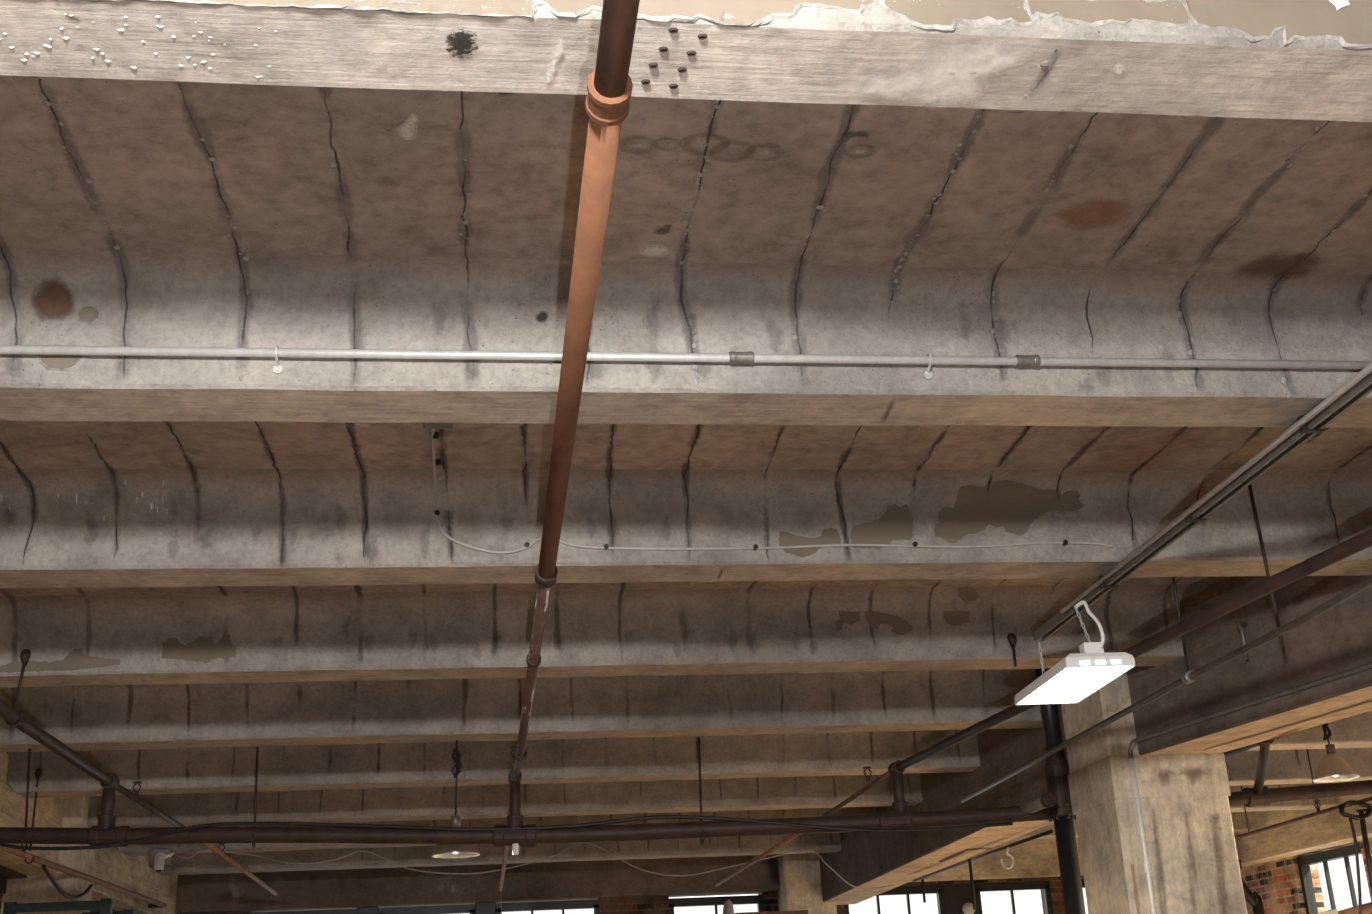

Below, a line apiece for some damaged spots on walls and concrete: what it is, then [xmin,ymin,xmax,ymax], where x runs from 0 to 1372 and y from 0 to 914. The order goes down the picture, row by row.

peeling [149,0,603,18]
peeling [637,0,1372,49]
crack [1023,2,1058,97]
crack [889,113,982,306]
crack [0,241,17,360]
crack [676,100,722,514]
peeling [779,504,914,557]
peeling [934,480,1084,543]
peeling [835,611,913,635]
peeling [944,587,979,626]